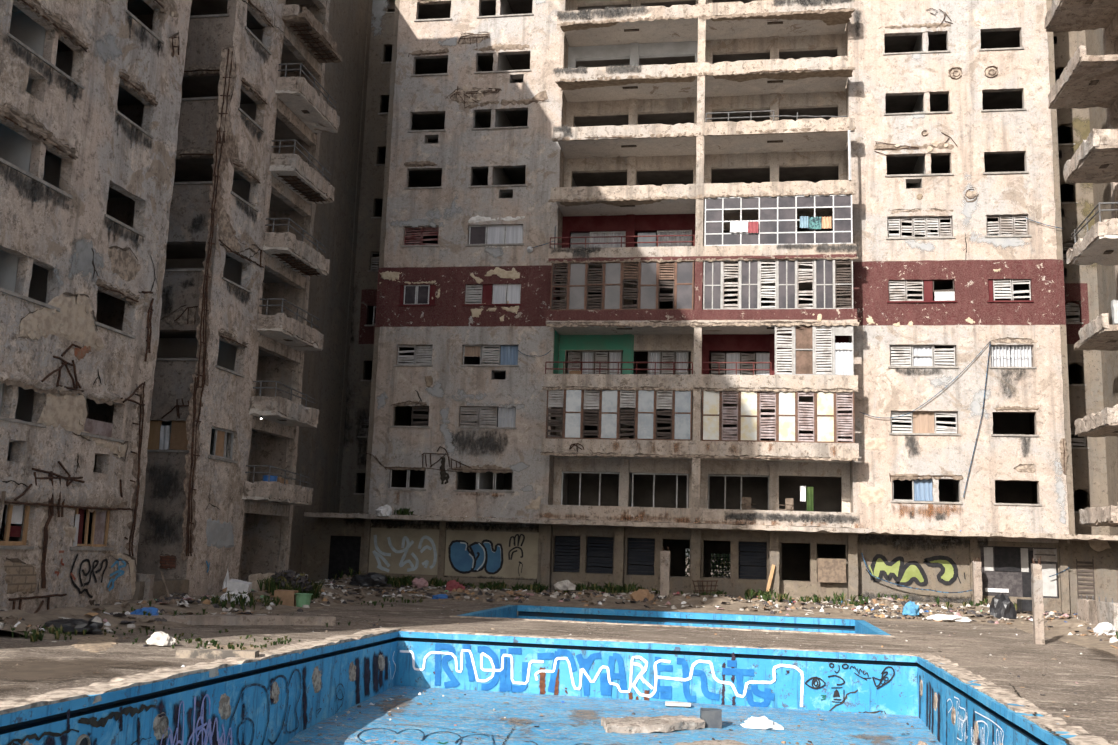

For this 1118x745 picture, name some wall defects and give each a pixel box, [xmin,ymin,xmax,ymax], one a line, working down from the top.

spalling [13,0,89,52]
spalling [290,23,338,63]
spalling [118,69,158,107]
flaking render [445,67,855,109]
spalling [0,103,78,160]
peeling [463,267,520,284]
spalling [159,32,326,570]
peeling [471,301,519,321]
spalling [4,246,154,613]
leakage [451,431,508,455]